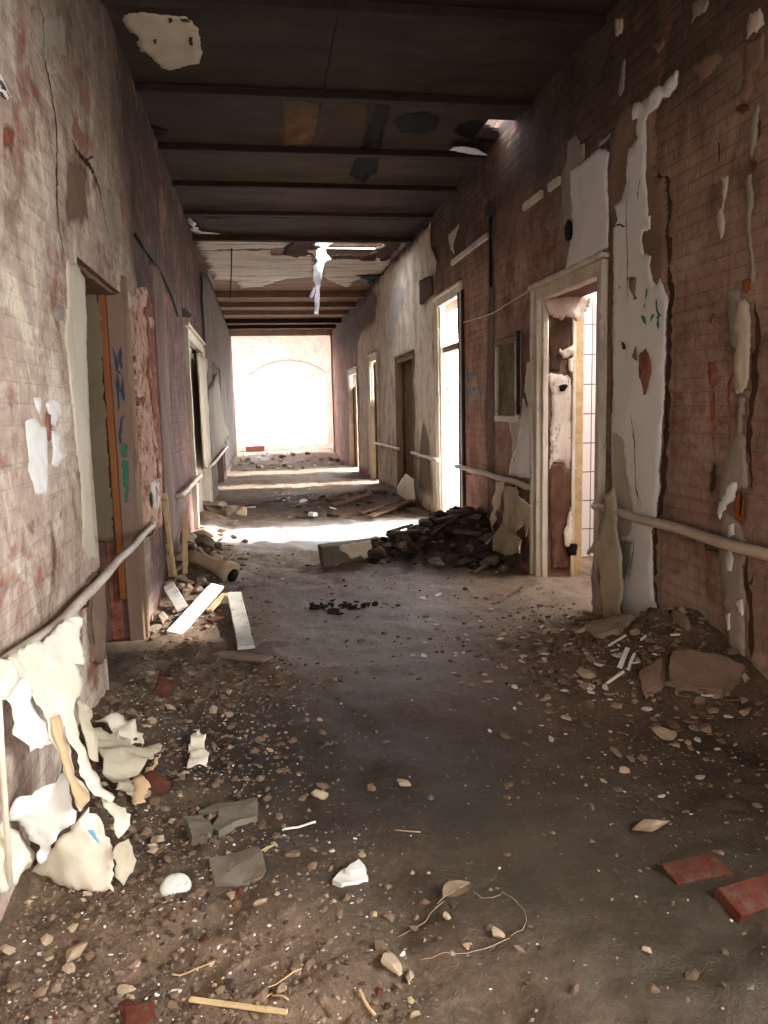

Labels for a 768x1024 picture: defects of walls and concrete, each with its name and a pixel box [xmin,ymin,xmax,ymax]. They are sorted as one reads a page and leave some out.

crack [37,0,109,268]
peeling [122,12,203,71]
peeling [749,103,760,156]
peeling [746,8,765,39]
flaking render [25,261,108,665]
spalling [128,262,178,554]
flaking render [182,217,437,512]
flaking render [561,49,723,617]
peeling [708,174,756,657]